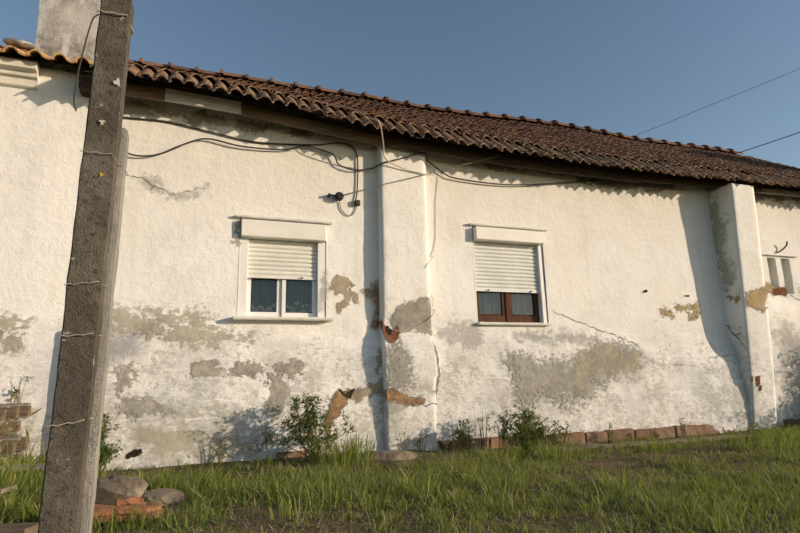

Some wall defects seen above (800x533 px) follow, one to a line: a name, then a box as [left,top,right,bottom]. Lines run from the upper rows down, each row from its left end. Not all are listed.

leakage [710,203,735,292]
leakage [0,309,37,357]
leakage [110,302,256,356]
peeling [321,271,375,314]
leakage [438,322,486,348]
leakage [515,328,593,343]
crack [554,310,638,346]
peeling [658,295,701,321]
peeling [726,280,788,313]
peeling [323,297,433,435]
crack [423,328,441,414]
leakage [132,425,259,464]